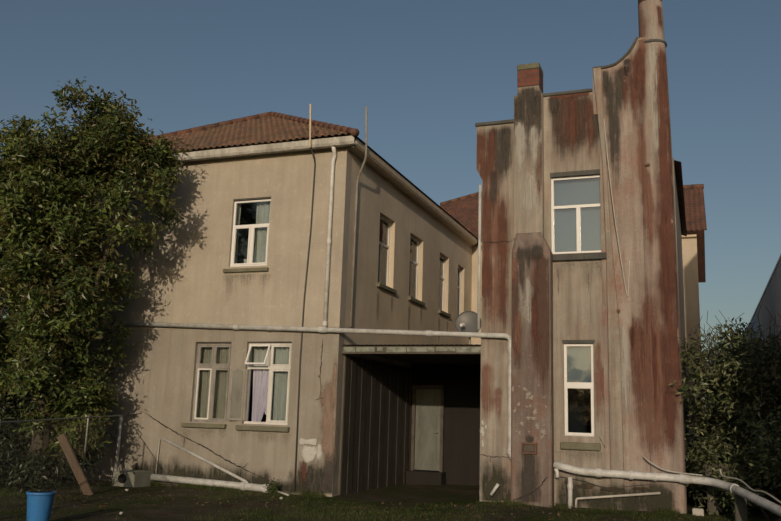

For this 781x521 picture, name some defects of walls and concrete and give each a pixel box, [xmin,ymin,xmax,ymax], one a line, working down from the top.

leakage [487,88,599,214]
rust [550,92,594,148]
leakage [603,59,631,166]
rust [476,130,521,365]
rust [619,11,682,451]
rust [532,257,550,388]
leakage [135,450,335,494]